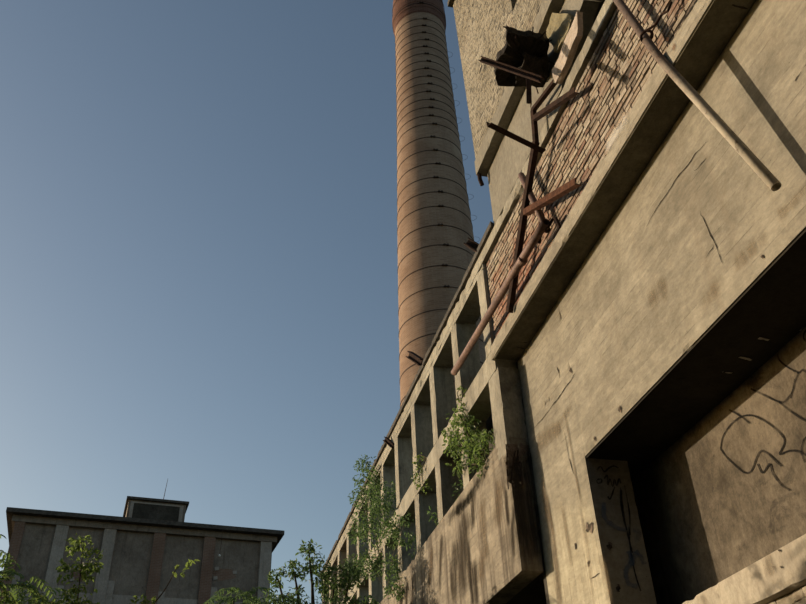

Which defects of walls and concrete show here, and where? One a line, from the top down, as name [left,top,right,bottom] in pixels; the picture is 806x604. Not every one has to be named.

crack [648,142,706,223]
leakage [451,479,487,604]
leakage [495,448,561,601]